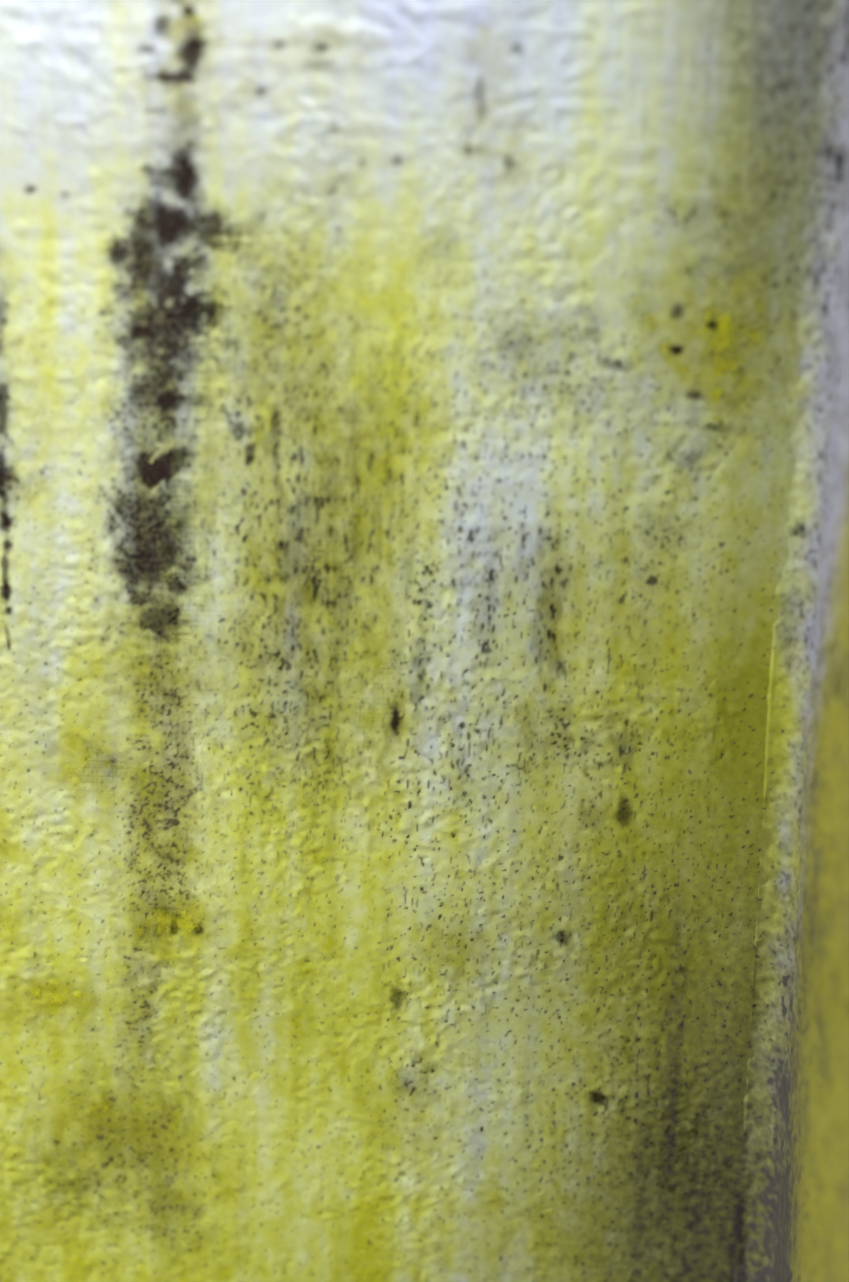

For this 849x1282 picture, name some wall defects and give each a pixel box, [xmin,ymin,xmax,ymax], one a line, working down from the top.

leakage [146,5,204,83]
leakage [0,384,19,613]
leakage [98,140,388,1047]